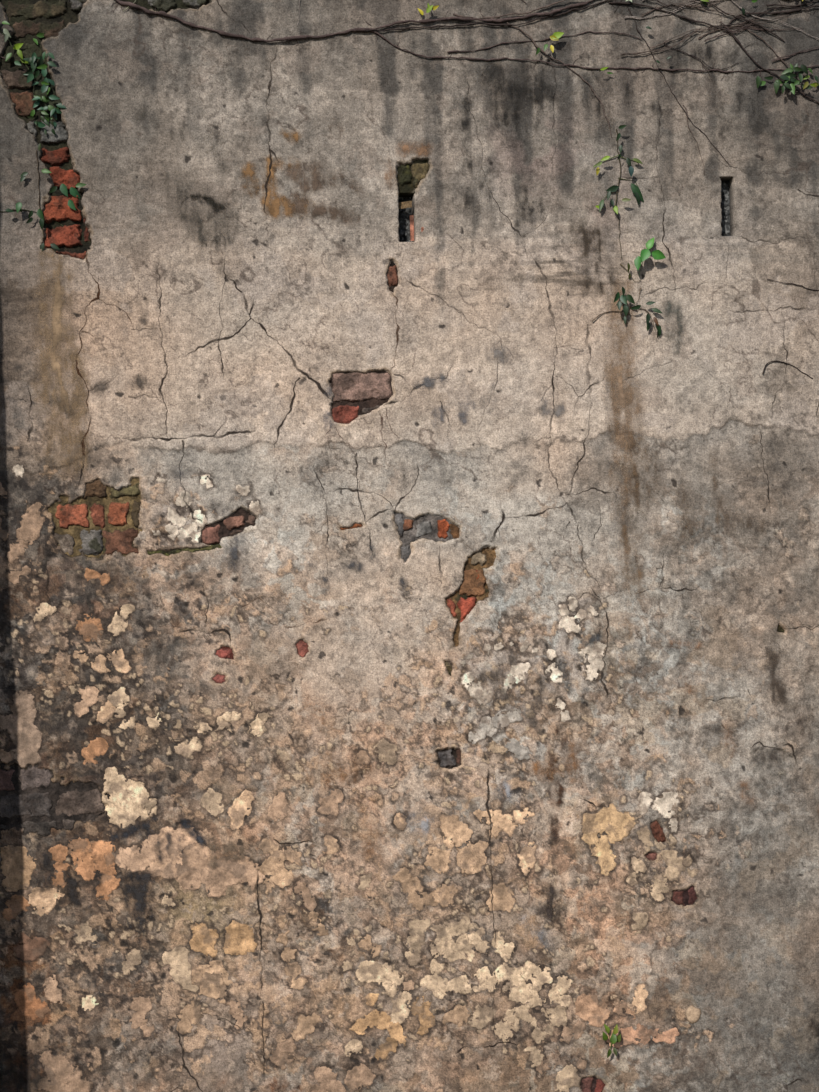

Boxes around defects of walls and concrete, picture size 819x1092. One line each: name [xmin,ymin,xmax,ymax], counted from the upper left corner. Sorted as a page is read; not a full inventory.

spalling [0,0,91,260]
leakage [177,186,236,247]
leakage [287,164,360,223]
leakage [493,66,554,127]
leakage [579,227,614,293]
crack [76,259,328,521]
spalling [329,371,393,424]
crack [381,282,448,449]
spalling [0,478,264,586]
crack [316,425,419,580]
crack [494,262,609,694]
peeling [437,641,563,769]